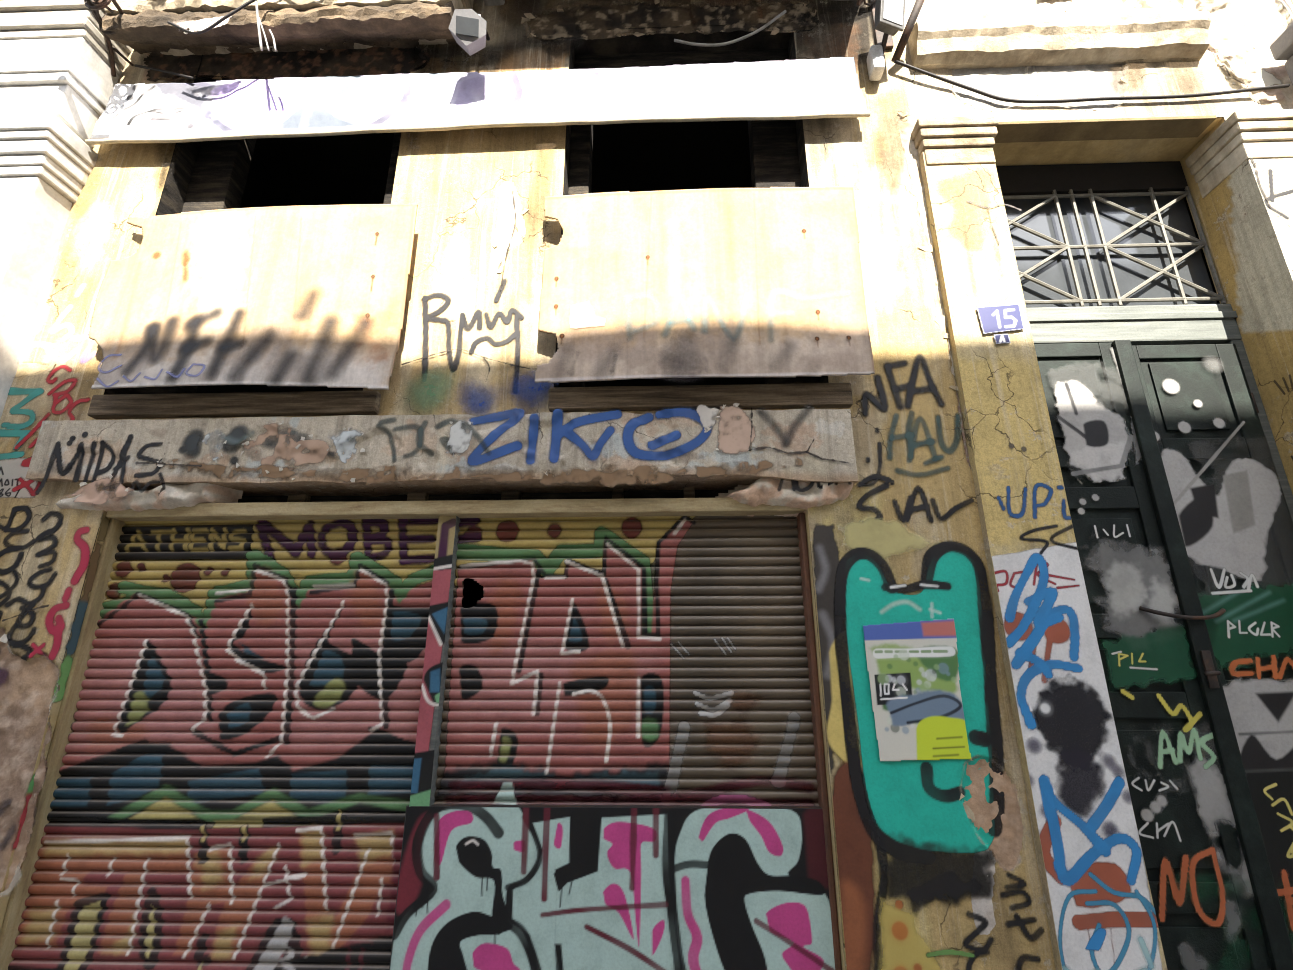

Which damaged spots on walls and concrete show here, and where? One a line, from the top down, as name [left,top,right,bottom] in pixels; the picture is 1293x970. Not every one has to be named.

flaking render [521,0,818,41]
flaking render [904,0,1293,112]
peeling [56,403,853,527]
flaking render [0,627,61,894]